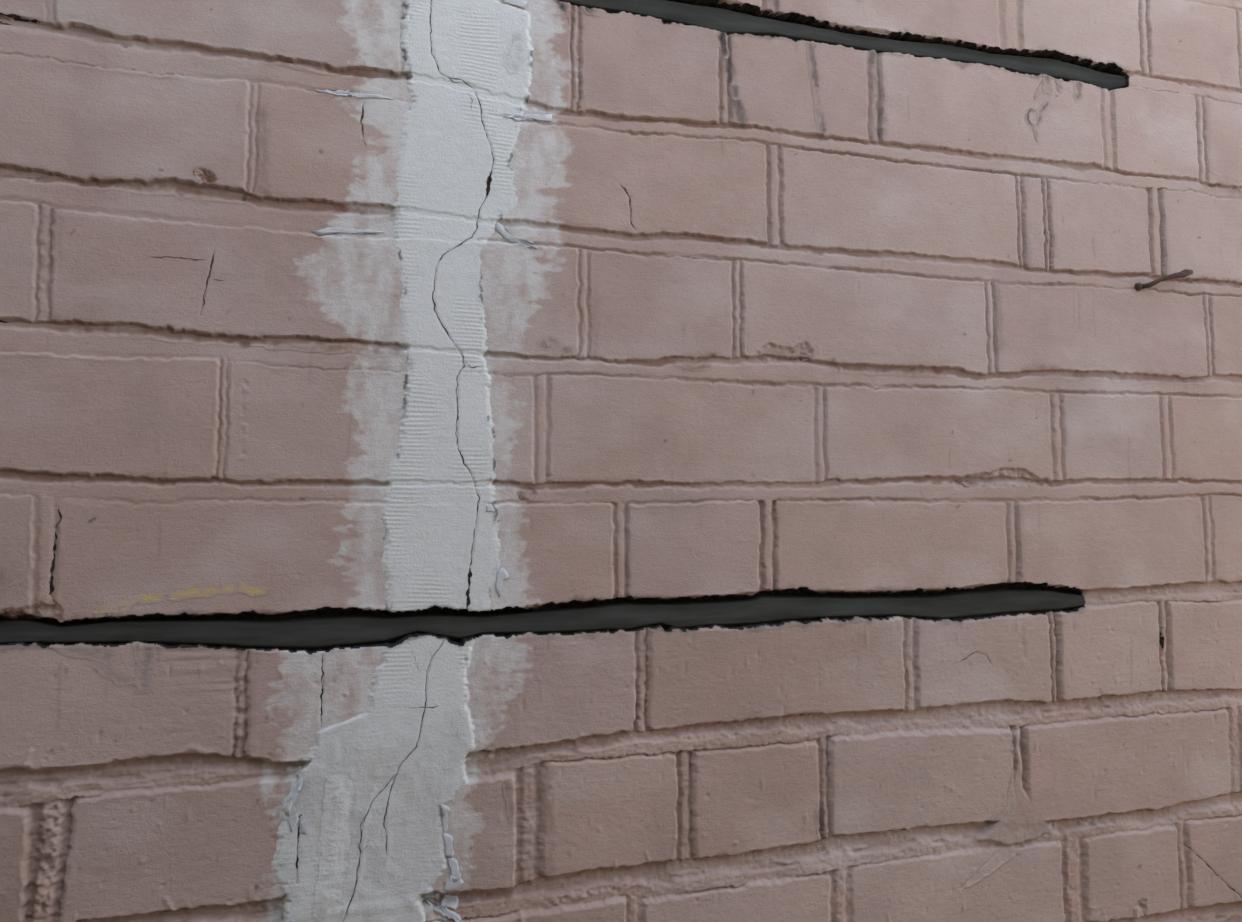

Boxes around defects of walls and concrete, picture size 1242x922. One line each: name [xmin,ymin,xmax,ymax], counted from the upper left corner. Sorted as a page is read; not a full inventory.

crack [0,13,40,25]
crack [359,107,367,147]
crack [155,254,223,306]
crack [430,0,494,612]
crack [49,509,62,604]
crack [318,655,326,723]
crack [344,641,444,918]
crack [295,814,303,879]